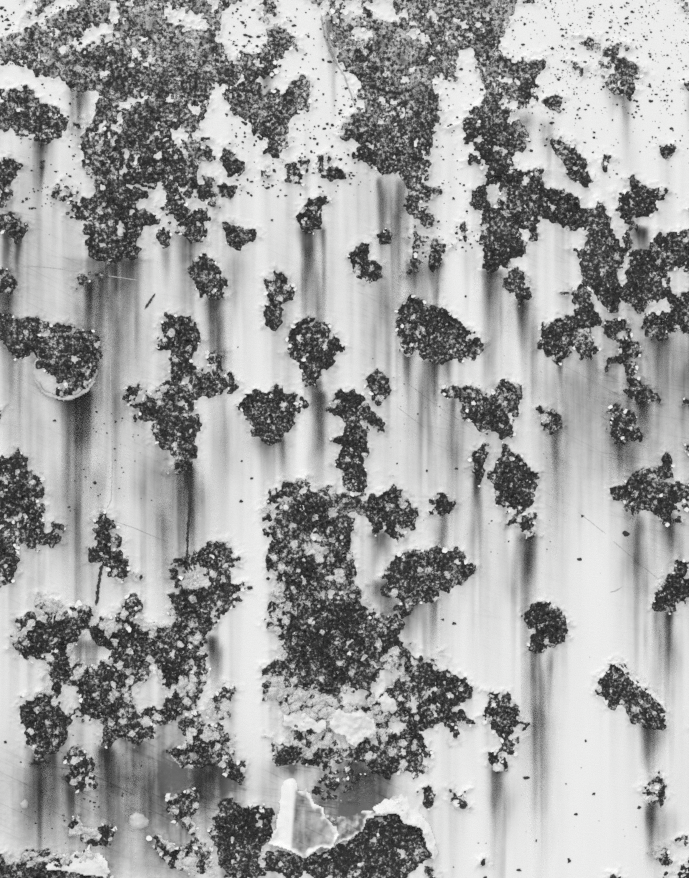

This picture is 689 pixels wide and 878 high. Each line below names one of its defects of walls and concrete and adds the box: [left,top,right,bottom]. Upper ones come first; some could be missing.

peeling [282,708,377,747]
peeling [378,692,397,714]
peeling [607,660,666,711]
peeling [268,778,438,860]